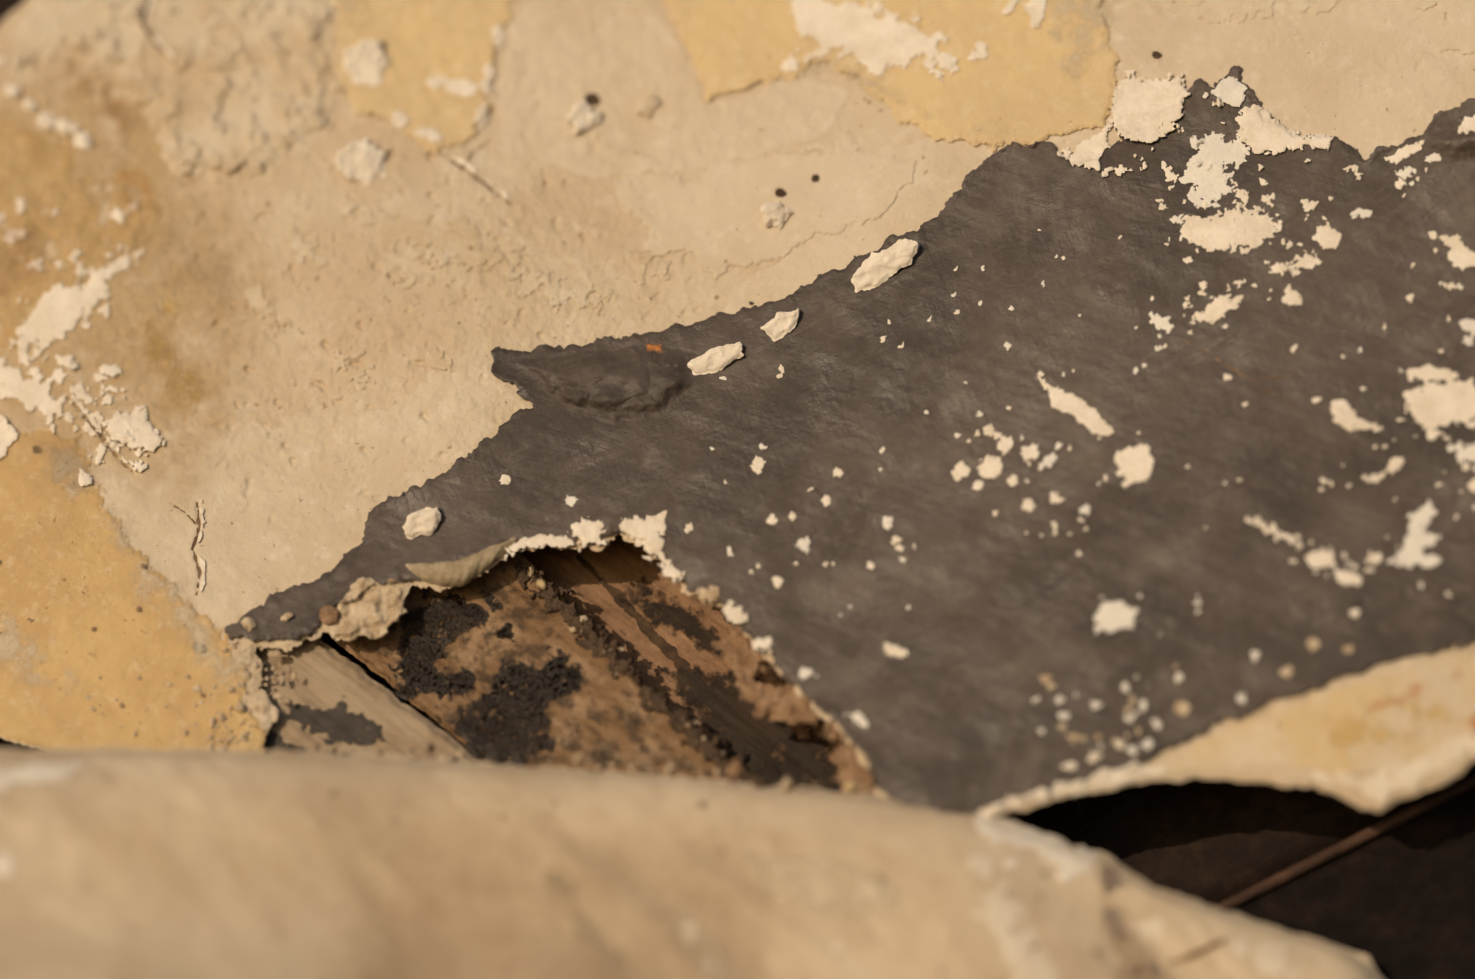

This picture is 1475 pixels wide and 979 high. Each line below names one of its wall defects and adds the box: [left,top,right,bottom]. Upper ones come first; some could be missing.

spalling [0,0,389,192]
peeling [392,108,442,143]
peeling [426,25,506,130]
peeling [780,0,988,82]
peeling [1002,0,1047,29]
peeling [0,198,166,486]
peeling [750,443,768,474]
peeling [951,411,1090,556]
crack [169,499,206,596]
flaking render [0,495,1475,979]